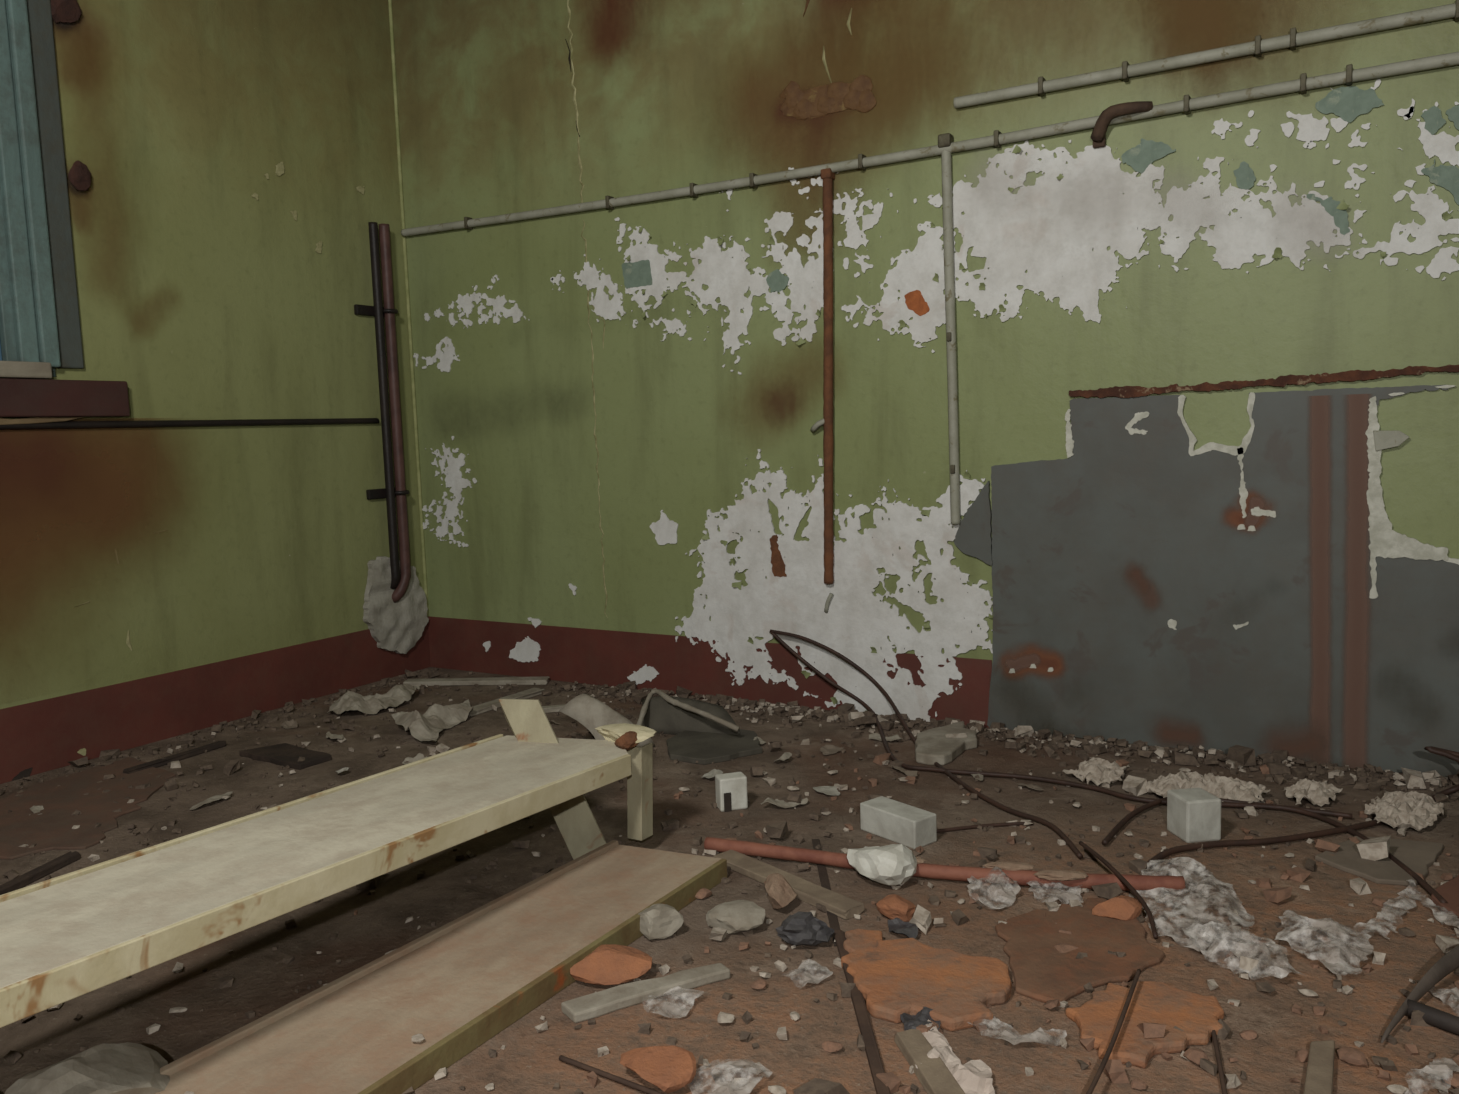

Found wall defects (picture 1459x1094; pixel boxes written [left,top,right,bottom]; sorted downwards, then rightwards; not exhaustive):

rust [731,0,939,213]
rust [0,418,174,626]
peeling [422,436,477,547]
peeling [413,275,529,372]
peeling [650,449,993,722]
peeling [550,79,1459,375]
peeling [1065,409,1074,458]
peeling [1125,411,1150,435]
peeling [1237,448,1276,518]
rust [1069,364,1459,770]